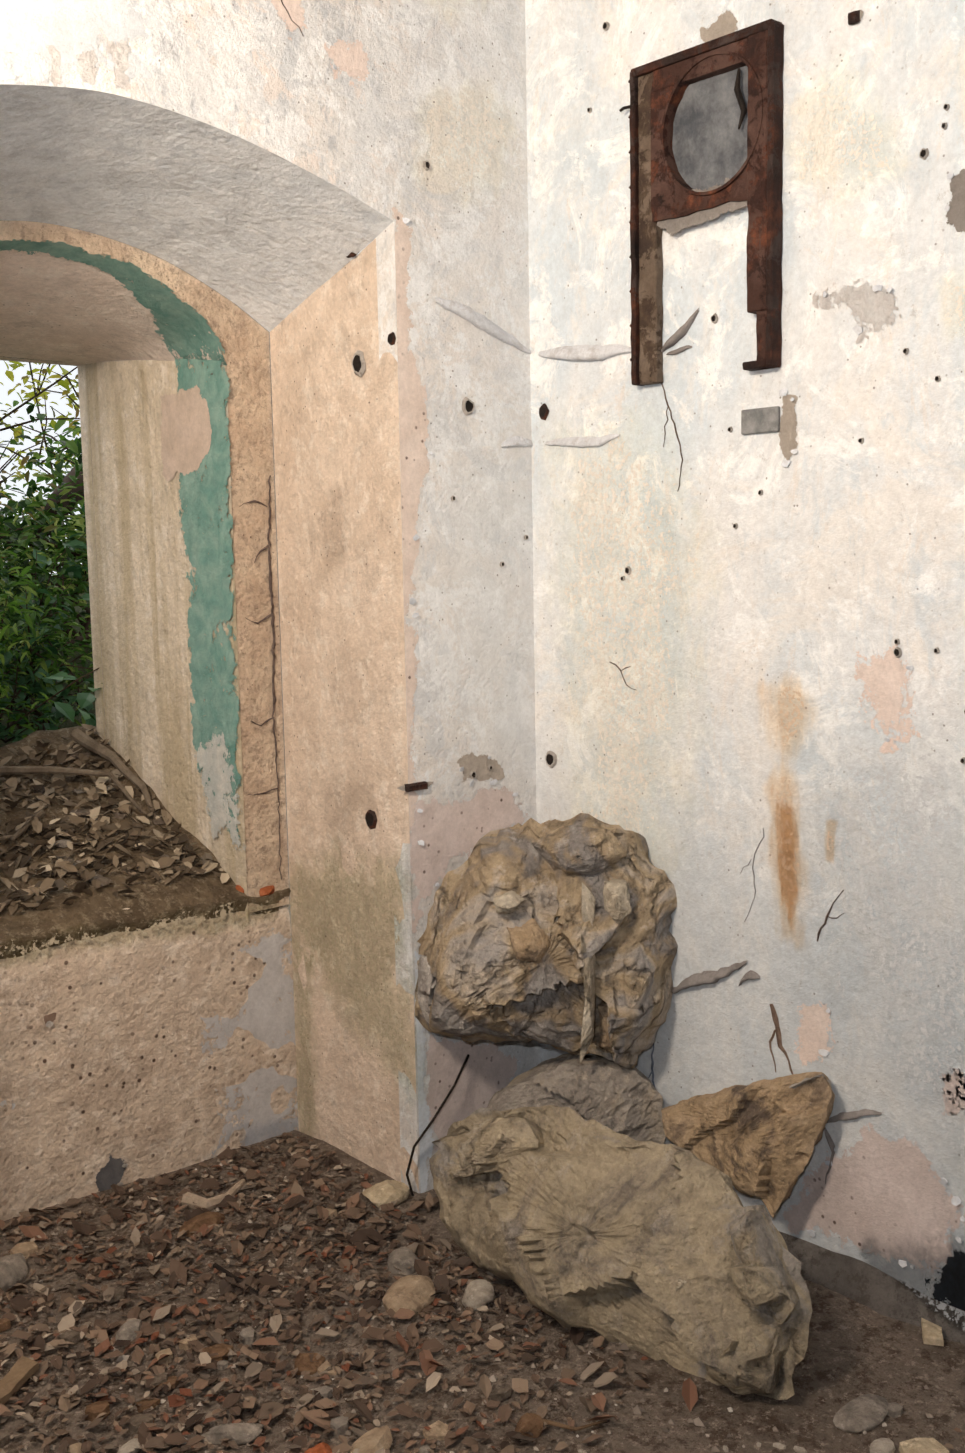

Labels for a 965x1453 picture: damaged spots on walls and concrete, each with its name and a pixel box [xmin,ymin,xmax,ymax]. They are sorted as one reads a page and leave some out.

spalling [944,169,965,232]
damp [863,1244,965,1331]